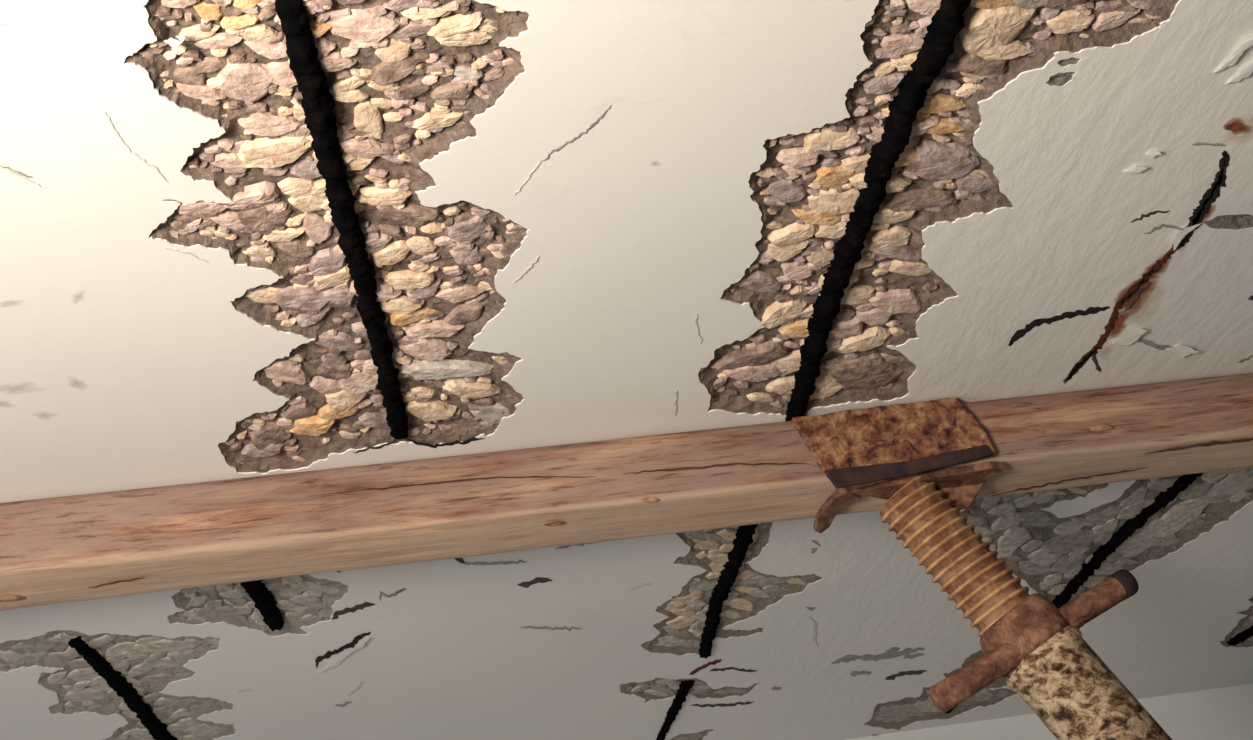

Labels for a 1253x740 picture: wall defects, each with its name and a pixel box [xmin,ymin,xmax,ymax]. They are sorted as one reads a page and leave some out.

crack [0,164,44,188]
spalling [124,0,529,473]
spalling [698,0,941,415]
spalling [805,0,1179,412]
rust [1110,259,1168,335]
spalling [1173,214,1253,251]
spalling [0,574,348,740]
spalling [620,678,762,703]
spalling [641,522,823,655]
spalling [865,677,1018,730]
spalling [959,467,1253,602]
spalling [1219,596,1253,647]